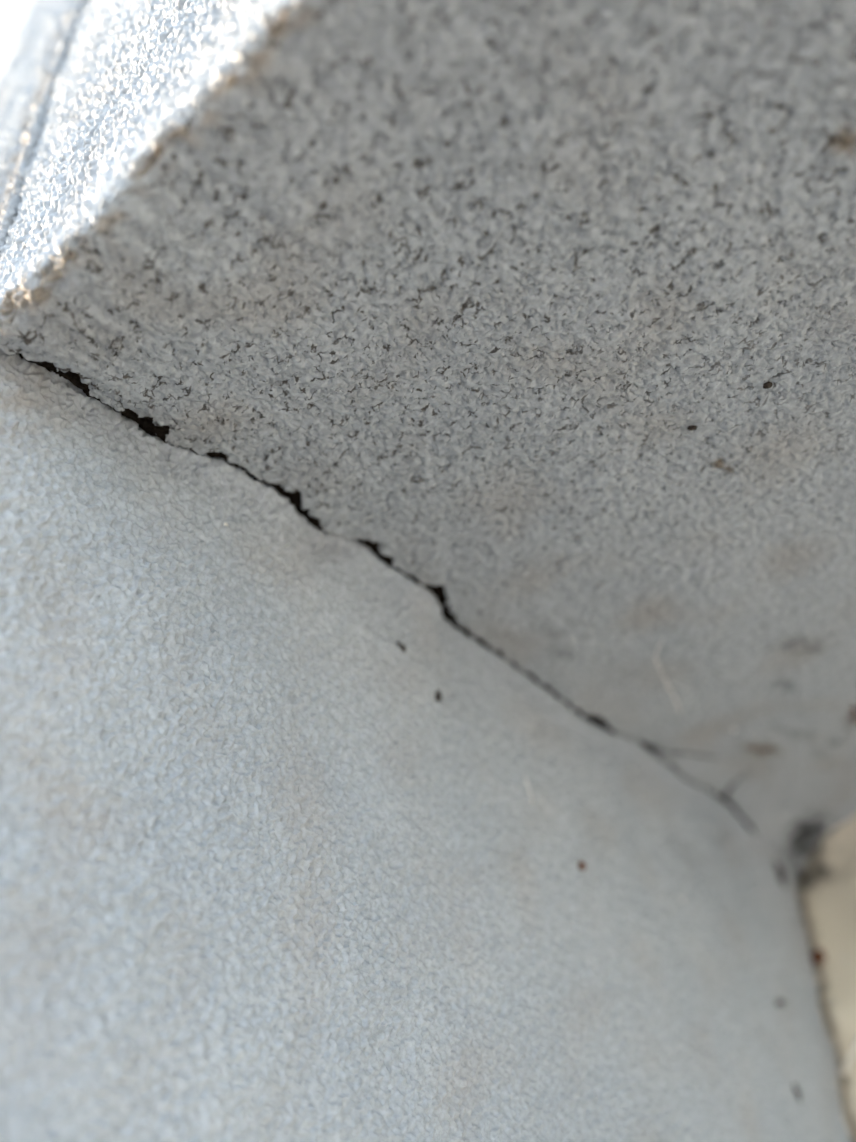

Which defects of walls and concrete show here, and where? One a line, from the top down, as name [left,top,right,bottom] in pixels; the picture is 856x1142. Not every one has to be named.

crack [16,353,790,870]